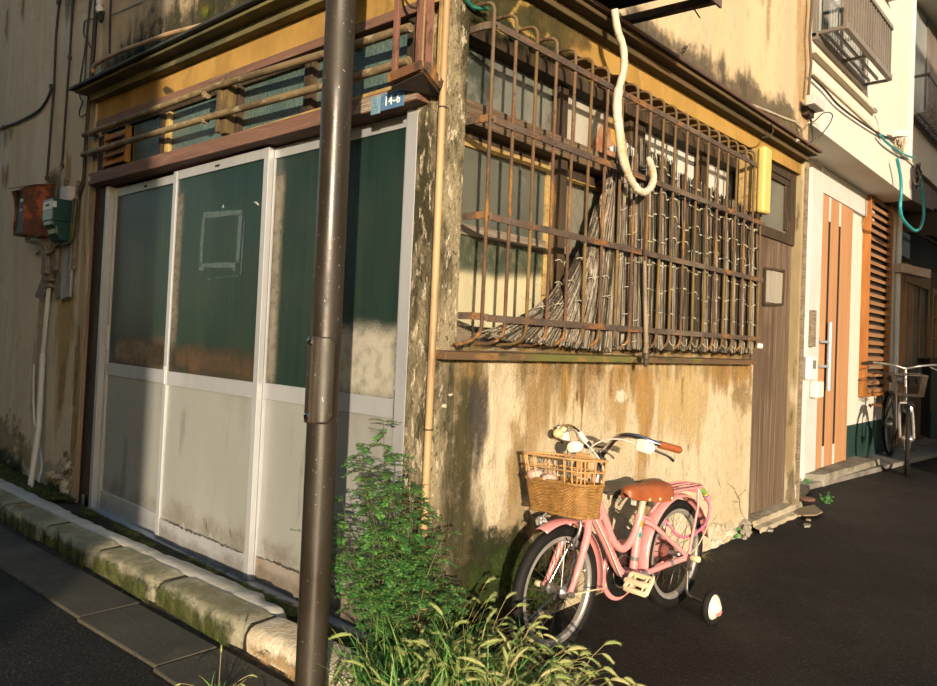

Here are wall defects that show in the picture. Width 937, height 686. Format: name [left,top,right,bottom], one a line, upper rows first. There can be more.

water stain [105,0,247,70]
water stain [626,0,809,138]
water stain [0,415,32,466]
water stain [57,295,73,416]
water stain [442,344,488,611]
rust [565,362,623,411]
water stain [638,452,646,483]
water stain [623,350,752,445]